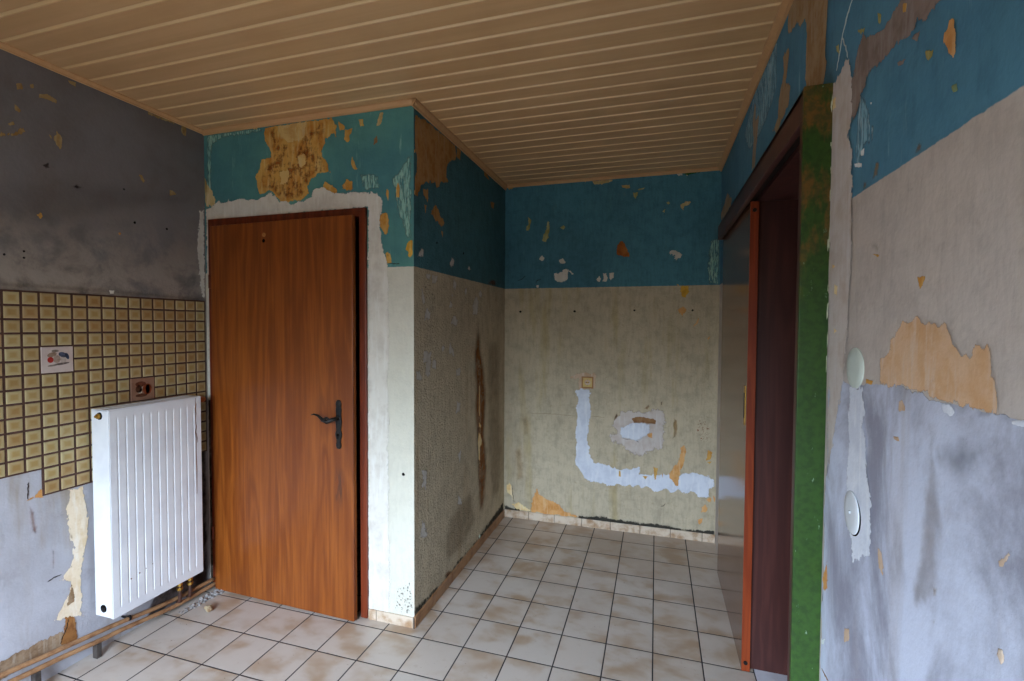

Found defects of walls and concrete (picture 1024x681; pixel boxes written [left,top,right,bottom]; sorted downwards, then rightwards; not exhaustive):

peeling [255,112,383,203]
peeling [414,115,461,237]
peeling [617,241,630,257]
peeling [506,483,576,517]
flaking render [609,409,666,456]
peeling [669,445,686,486]
flaking render [820,316,1024,681]
peeling [0,485,89,680]